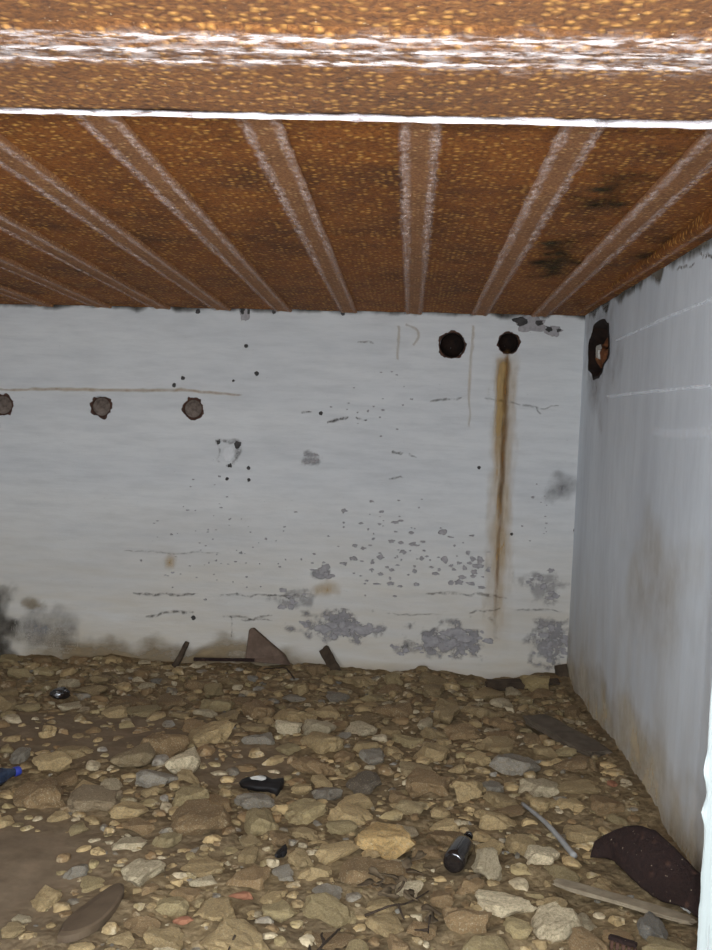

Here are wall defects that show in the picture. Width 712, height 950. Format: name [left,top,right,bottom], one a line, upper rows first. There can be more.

corrosion [496,356,508,470]
leakage [0,608,48,656]
peeling [287,609,385,644]
peeling [390,620,494,658]
peeling [528,619,569,668]